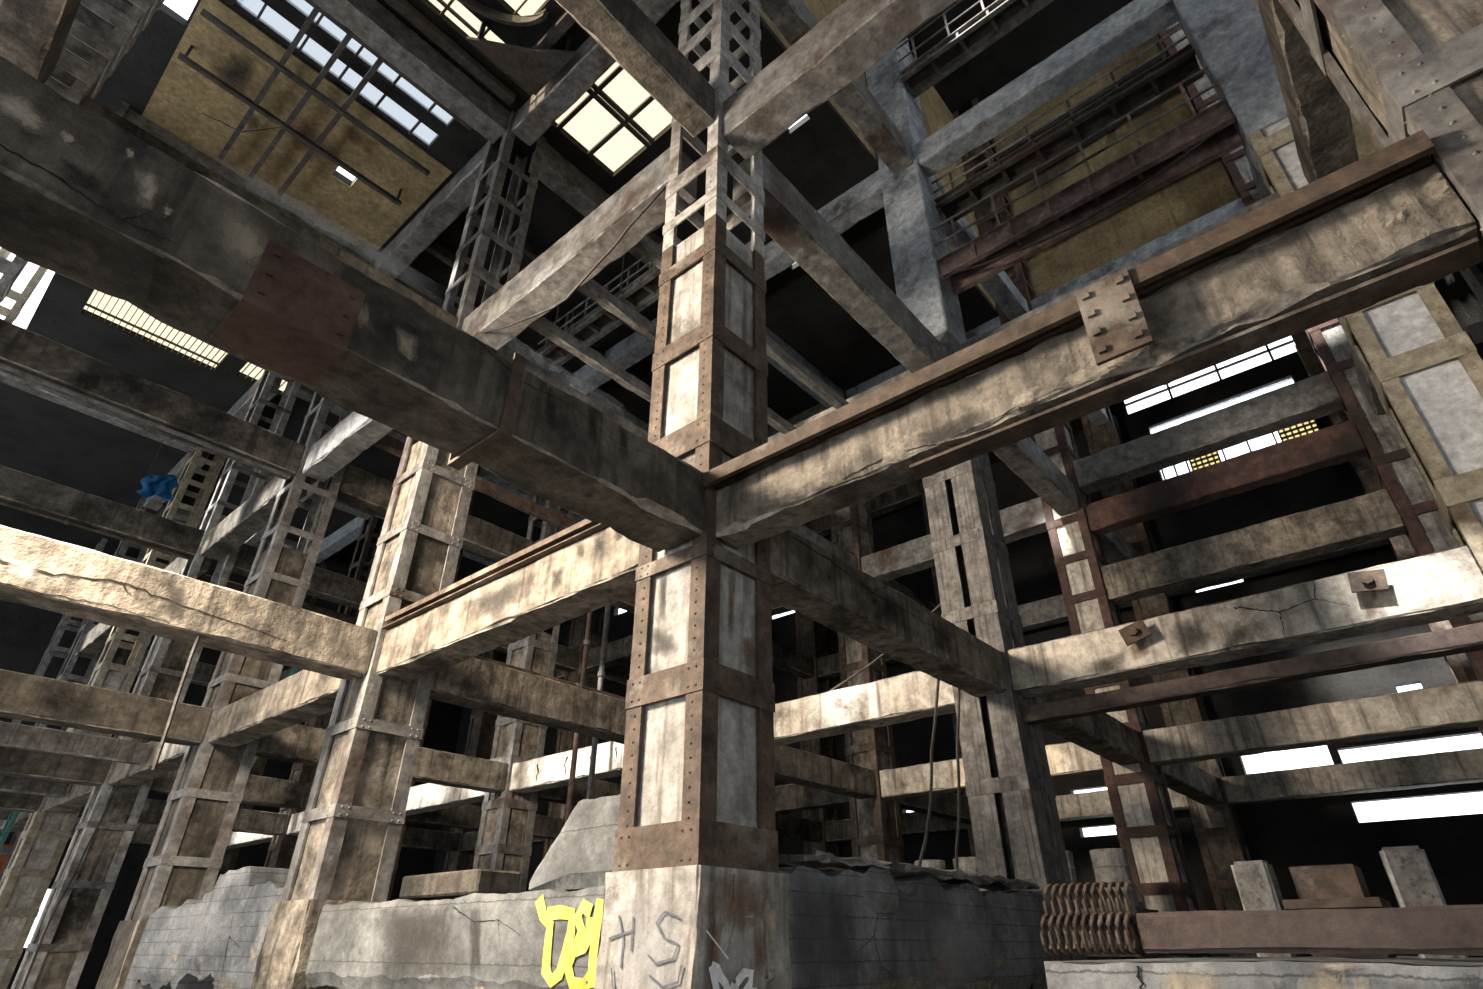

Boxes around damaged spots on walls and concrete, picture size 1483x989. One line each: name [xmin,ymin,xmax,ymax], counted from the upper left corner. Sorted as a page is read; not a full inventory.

rust [230,222,264,259]
rust [400,334,413,355]
rust [1134,640,1145,655]
crack [1136,966,1144,989]